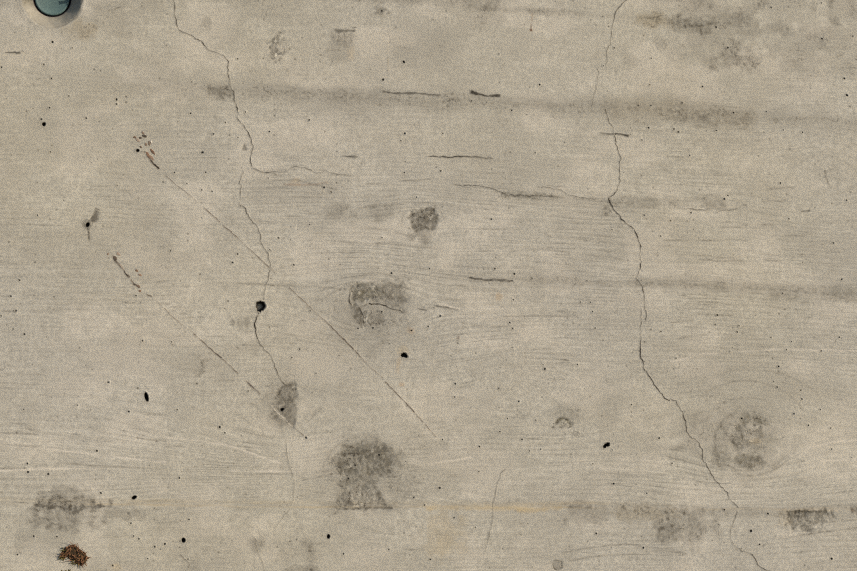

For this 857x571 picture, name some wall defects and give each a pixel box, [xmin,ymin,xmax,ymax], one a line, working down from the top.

crack [381,89,442,97]
crack [427,153,494,161]
crack [173,0,359,397]
crack [450,0,770,571]
crack [348,289,459,327]